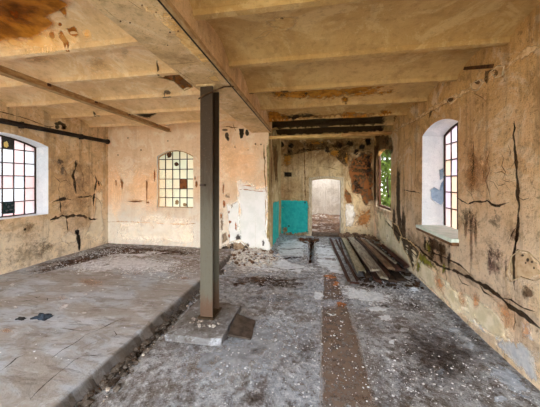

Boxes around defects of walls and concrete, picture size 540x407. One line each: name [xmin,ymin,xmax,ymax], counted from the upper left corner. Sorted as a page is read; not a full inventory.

spalling [158,75,193,91]
crack [50,160,102,230]
water stain [271,141,355,186]
spalling [344,150,374,206]
spalling [220,232,250,250]
water stain [356,143,536,383]
crack [385,123,540,329]